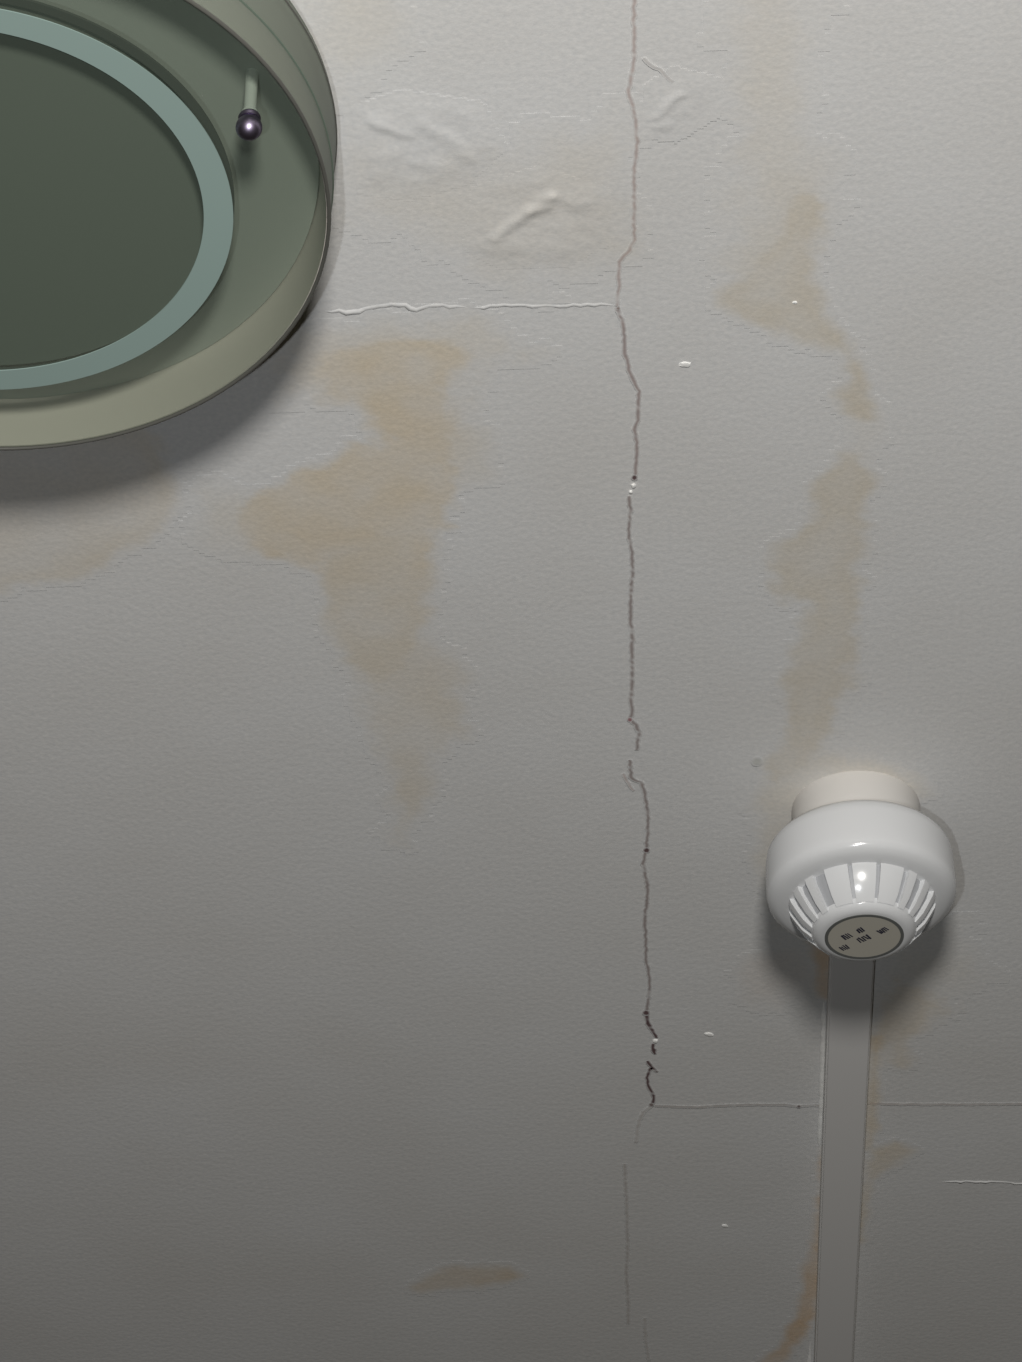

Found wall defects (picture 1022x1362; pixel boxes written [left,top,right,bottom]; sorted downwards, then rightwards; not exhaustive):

leakage [0,0,654,855]
crack [615,0,819,1361]
leakage [697,0,943,935]
leakage [859,911,1010,1254]